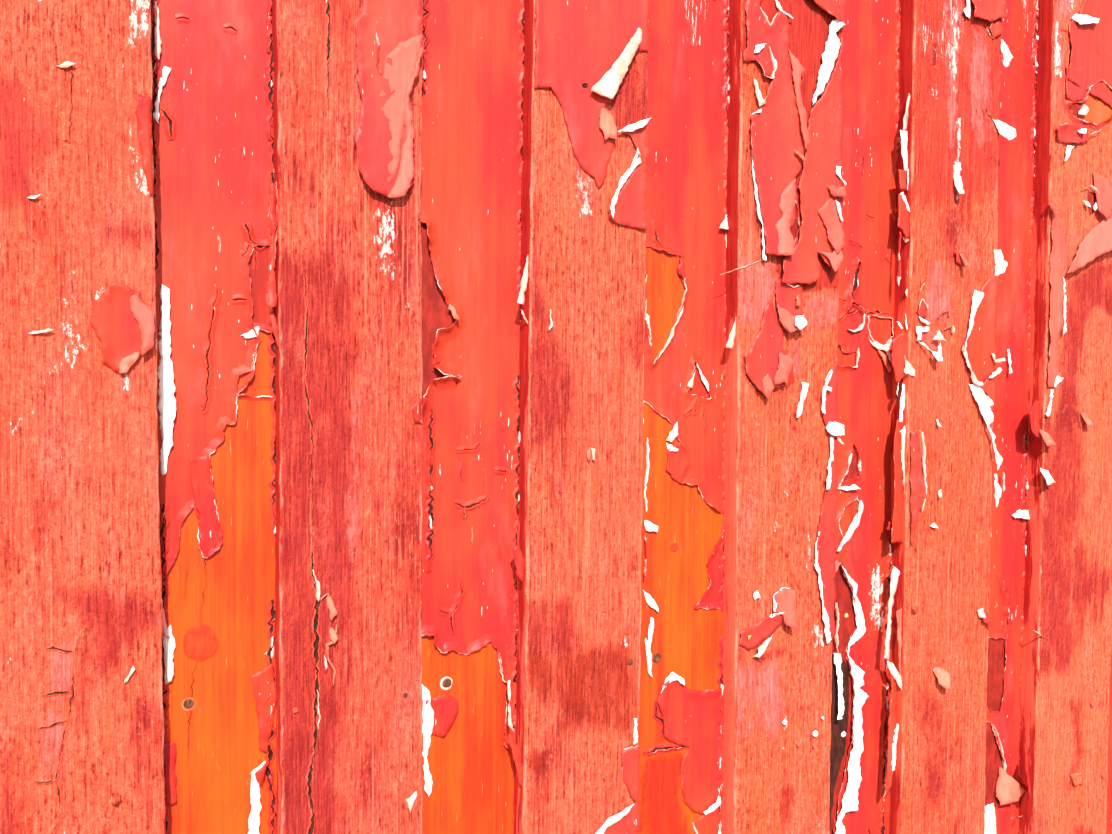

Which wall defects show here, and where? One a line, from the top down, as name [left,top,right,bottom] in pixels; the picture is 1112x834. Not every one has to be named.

peeling [354,0,423,280]
peeling [534,0,690,371]
peeling [1054,0,1112,162]
peeling [28,270,84,393]
peeling [89,281,176,475]
peeling [162,182,279,834]
peeling [512,545,525,583]
peeling [595,395,724,834]
peeling [682,351,714,416]
peeling [726,0,1016,834]
crack [34,622,90,834]
peeling [406,625,523,834]